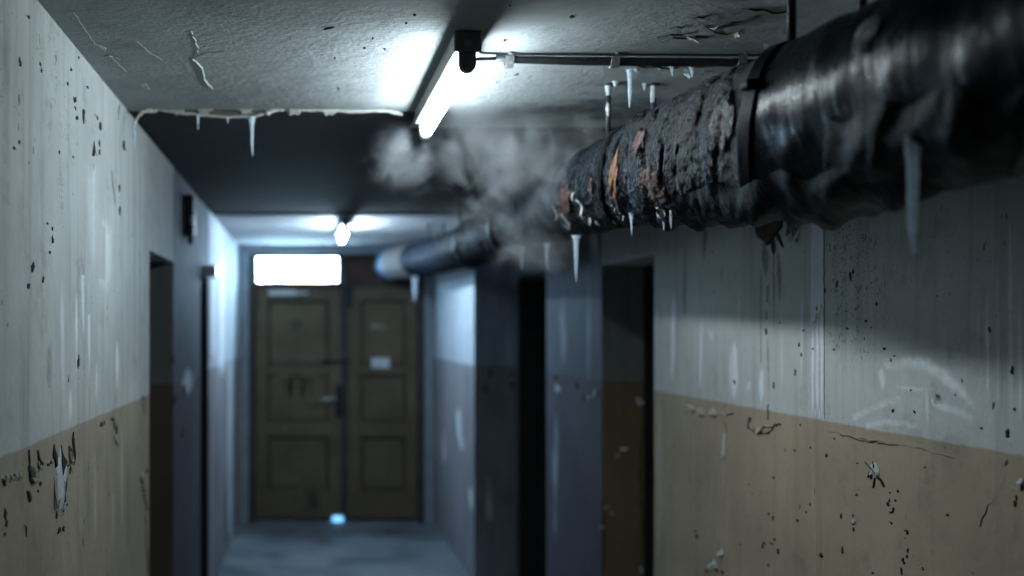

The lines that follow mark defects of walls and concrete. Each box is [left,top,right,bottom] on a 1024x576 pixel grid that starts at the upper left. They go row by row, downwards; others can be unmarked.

peeling [657,0,830,48]
crack [191,31,223,89]
peeling [747,404,781,435]
crack [832,432,952,457]
peeling [1,432,76,534]
spalling [856,462,909,535]